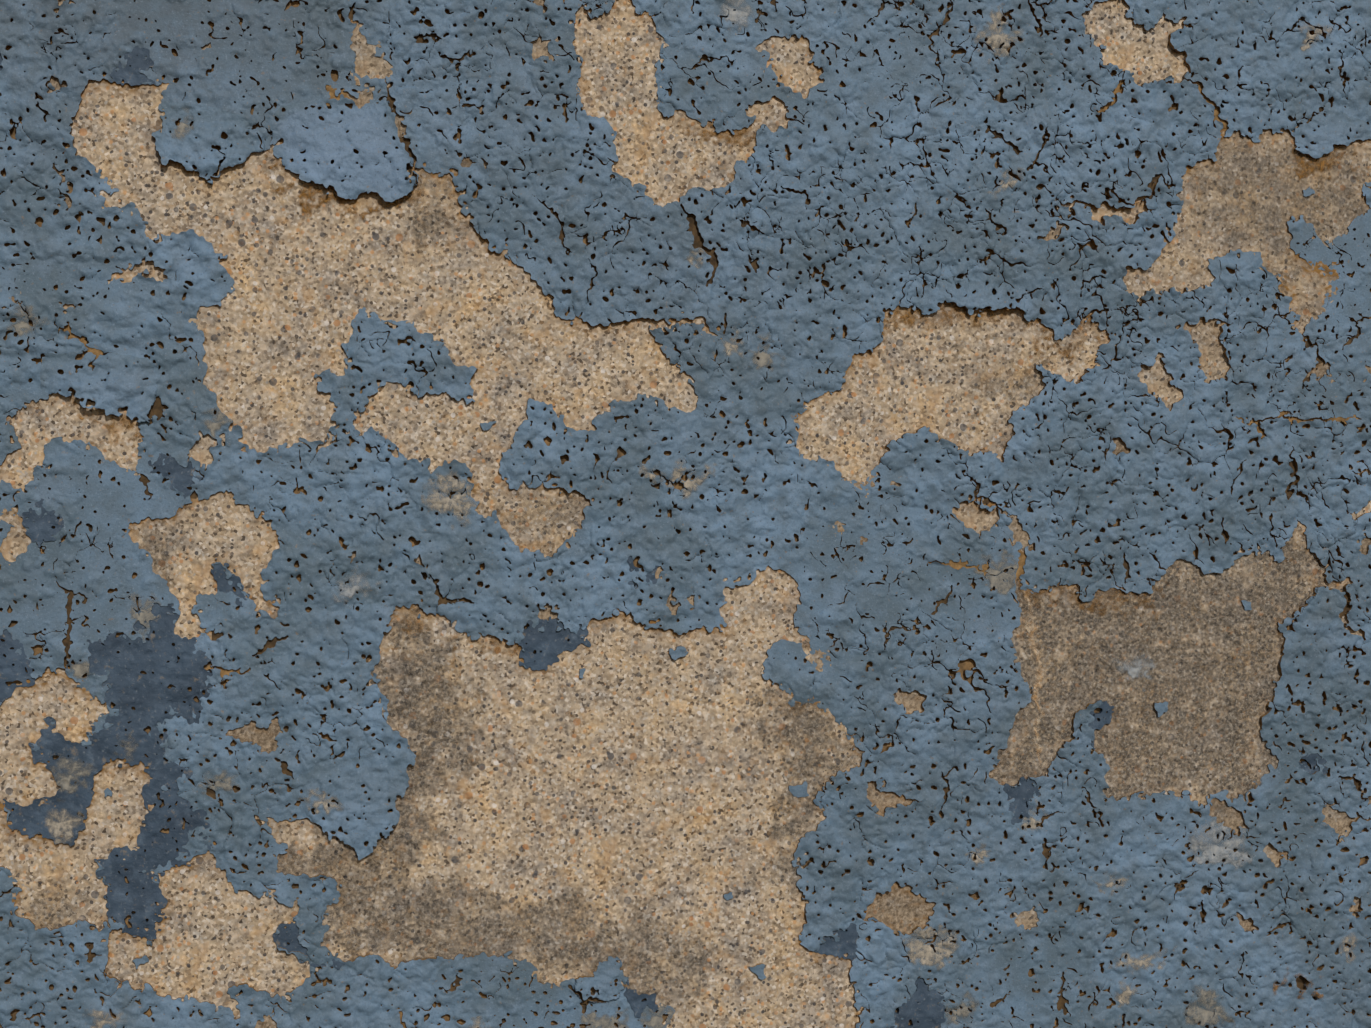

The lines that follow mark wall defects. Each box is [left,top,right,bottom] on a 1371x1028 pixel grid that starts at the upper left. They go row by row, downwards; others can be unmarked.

peeling [38,20,722,560]
crack [539,201,597,305]
peeling [523,0,824,207]
crack [680,205,763,334]
crack [781,186,809,205]
crack [867,0,952,66]
peeling [787,277,1116,498]
crack [985,123,1050,181]
peeling [1123,111,1371,343]
crack [1233,326,1361,537]
peeling [984,520,1352,835]
peeling [0,566,864,1028]